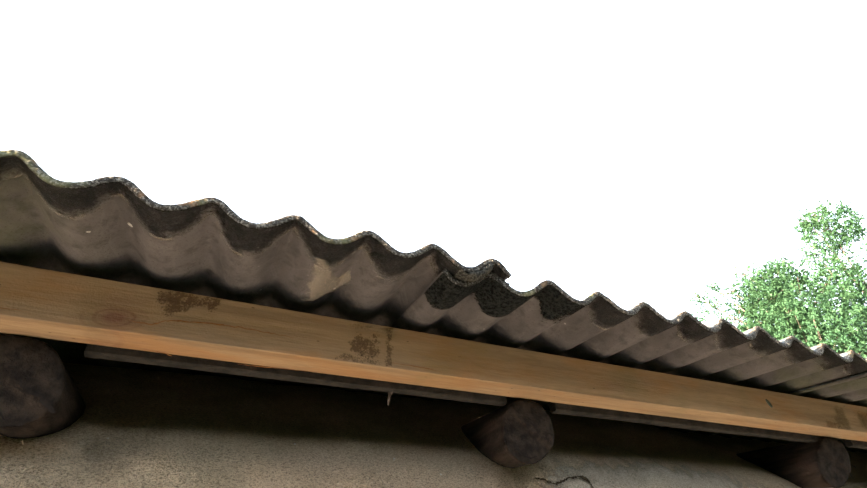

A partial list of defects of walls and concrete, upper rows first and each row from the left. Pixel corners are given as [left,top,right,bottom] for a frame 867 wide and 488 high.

crack [535,475,594,488]